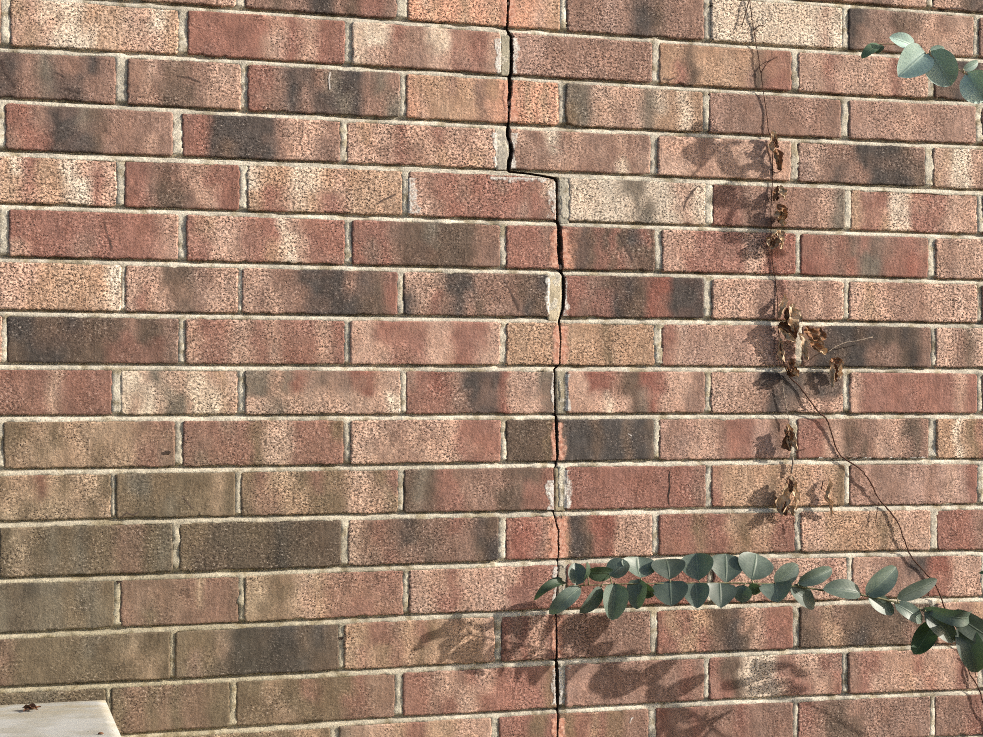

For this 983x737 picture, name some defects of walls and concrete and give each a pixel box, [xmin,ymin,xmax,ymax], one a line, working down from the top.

crack [504,0,565,737]